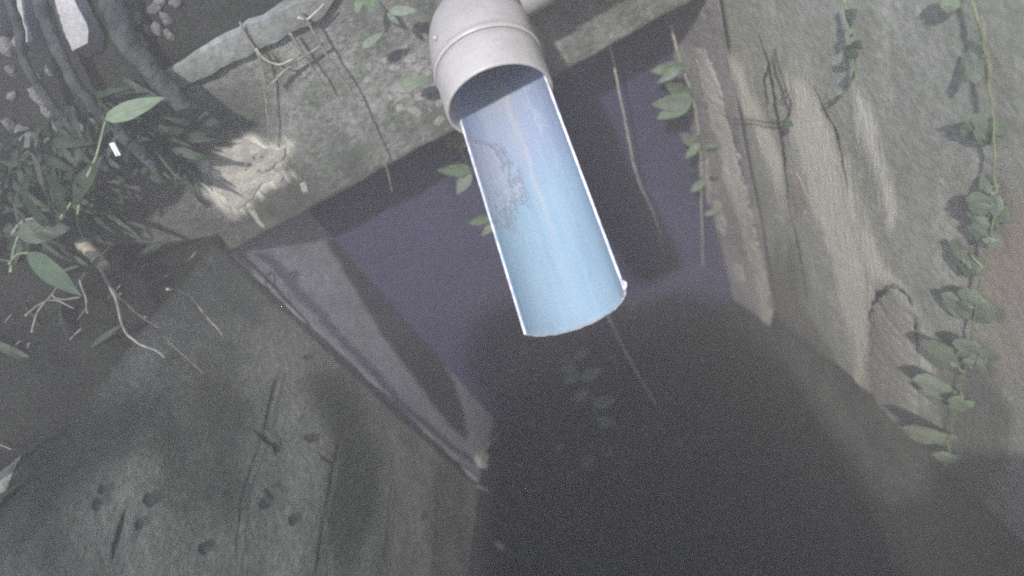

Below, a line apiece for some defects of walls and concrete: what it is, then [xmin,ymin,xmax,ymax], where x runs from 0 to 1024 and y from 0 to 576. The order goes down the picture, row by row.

crack [812,85,848,187]